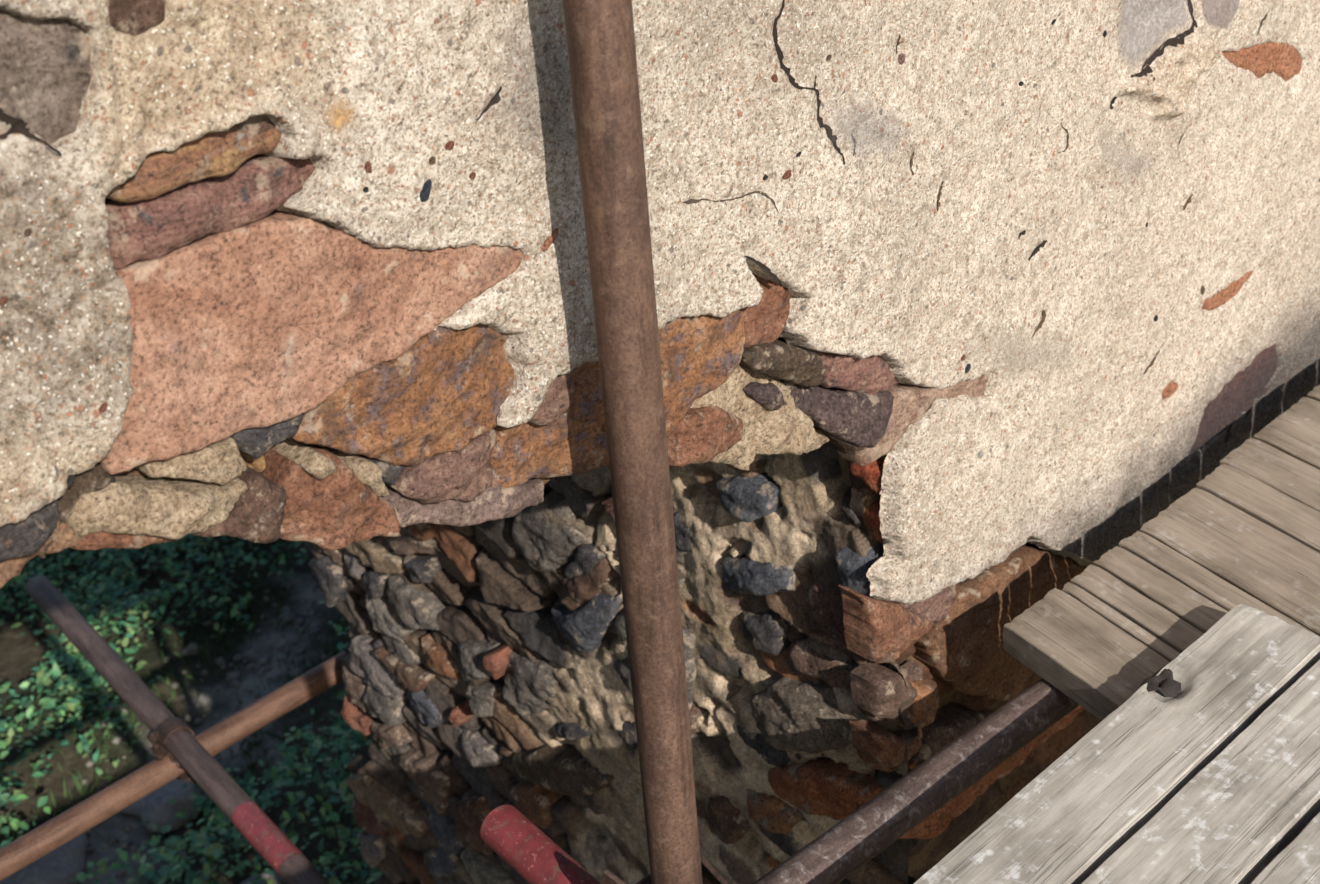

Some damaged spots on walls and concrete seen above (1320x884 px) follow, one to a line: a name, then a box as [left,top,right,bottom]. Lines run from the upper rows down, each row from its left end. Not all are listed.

crack [773,0,857,165]
crack [1131,0,1198,81]
flaking render [66,115,609,550]
flaking render [658,272,988,471]